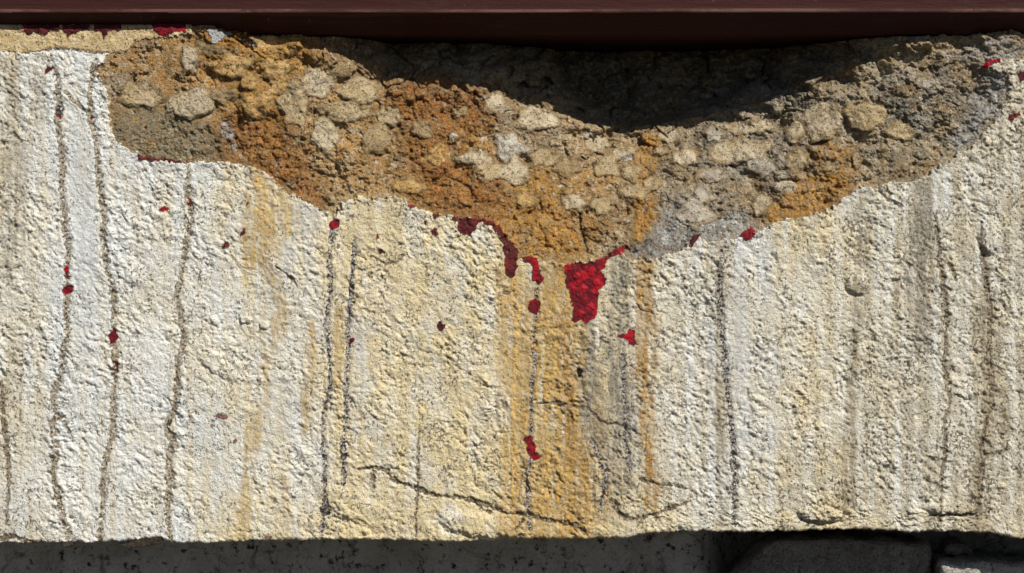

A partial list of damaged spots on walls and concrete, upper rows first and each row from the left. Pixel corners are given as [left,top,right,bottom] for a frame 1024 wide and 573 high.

corrosion [189,28,327,265]
corrosion [386,76,603,539]
crack [318,228,690,541]
spalling [0,23,1024,324]
corrosion [636,255,657,514]
corrosion [635,131,660,242]
leakage [581,201,752,495]